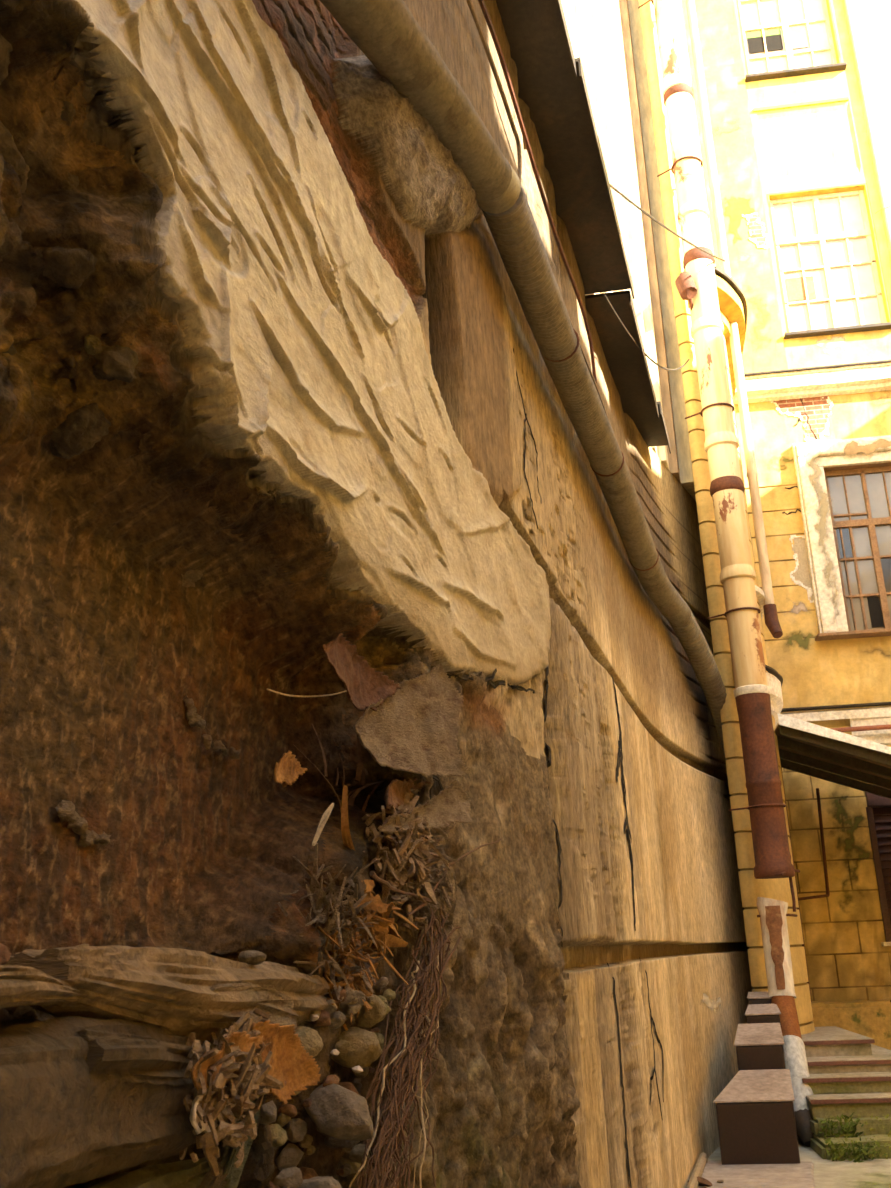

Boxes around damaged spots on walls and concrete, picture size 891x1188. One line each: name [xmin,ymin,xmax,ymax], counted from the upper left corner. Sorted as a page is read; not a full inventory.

peeling [769,396,833,442]
peeling [789,535,814,614]
corrosion [735,693,795,879]
crack [607,675,664,1188]
corrosion [765,905,785,990]